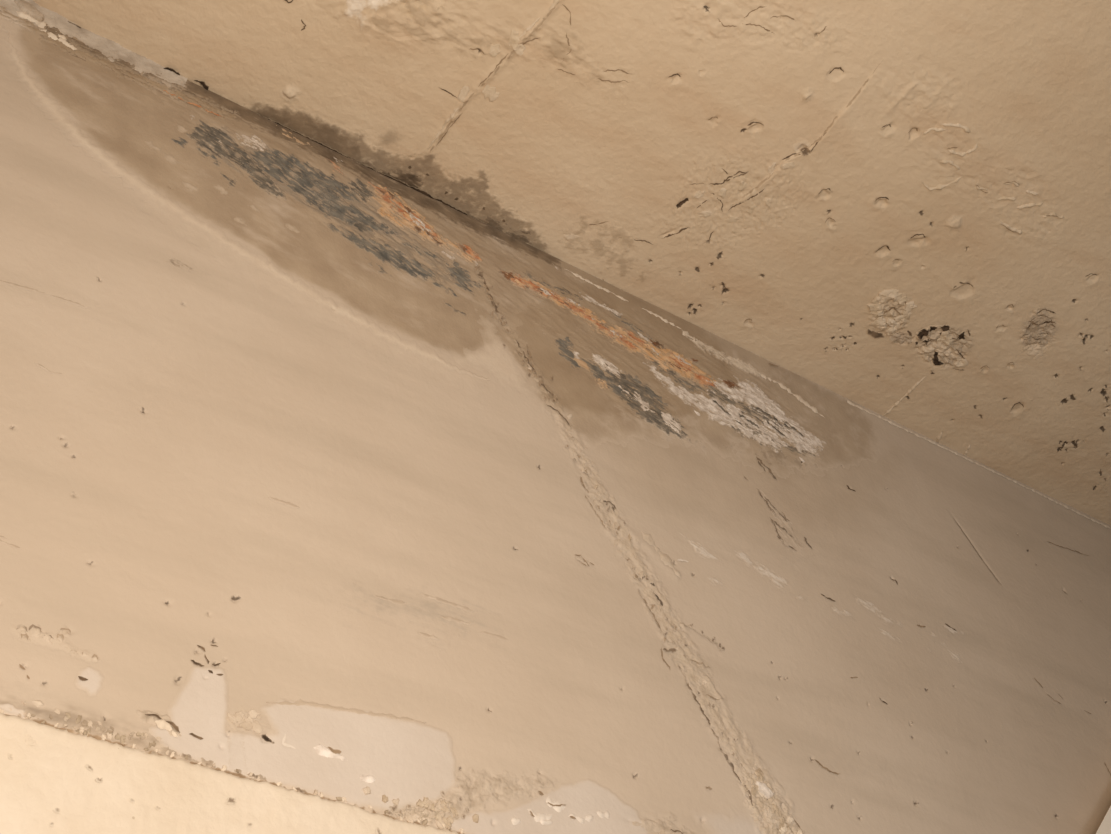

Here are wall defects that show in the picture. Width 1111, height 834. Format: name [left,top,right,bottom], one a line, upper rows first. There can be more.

crack [427,0,571,154]
rust [359,182,483,266]
water stain [0,16,924,592]
crack [483,277,569,424]
rust [496,269,719,389]
spalling [824,282,977,374]
spalling [1003,304,1060,361]
crack [580,477,616,530]
peeling [136,637,649,834]
crack [639,583,803,833]